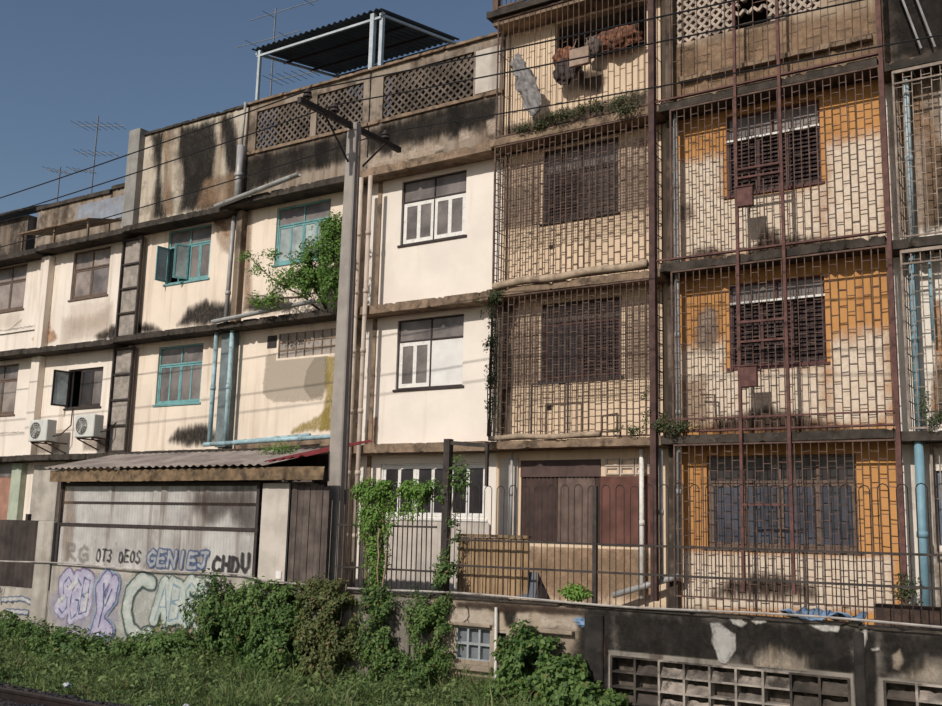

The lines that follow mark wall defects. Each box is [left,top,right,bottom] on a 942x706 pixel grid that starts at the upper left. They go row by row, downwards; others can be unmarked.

leakage [153,116,347,218]
leakage [896,78,942,231]
leakage [179,300,231,325]
leakage [169,425,216,446]
spalling [711,620,764,664]